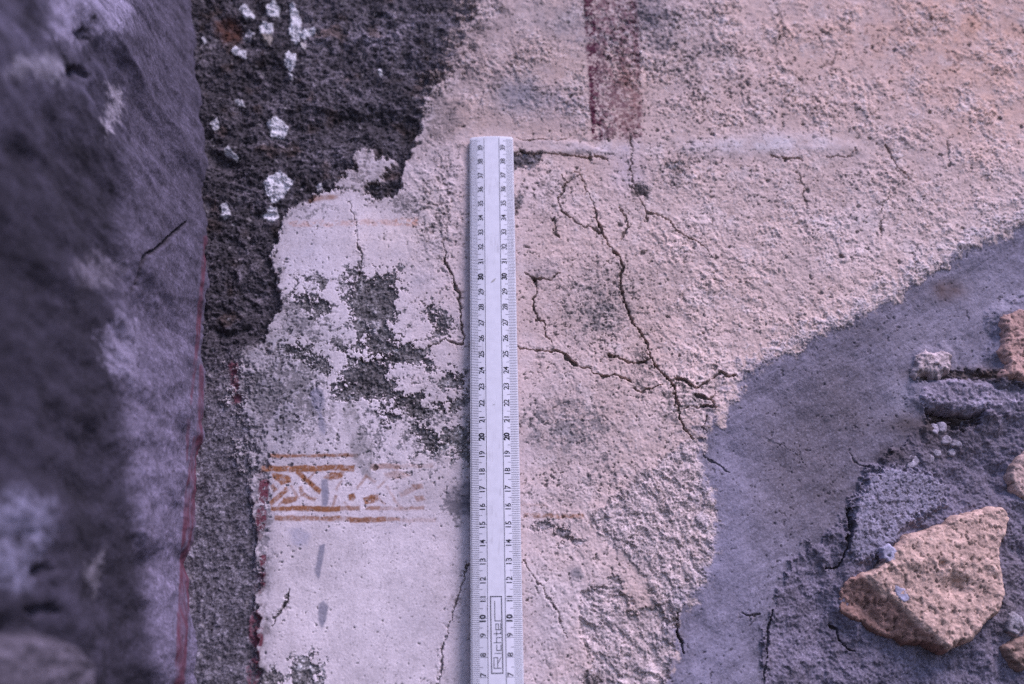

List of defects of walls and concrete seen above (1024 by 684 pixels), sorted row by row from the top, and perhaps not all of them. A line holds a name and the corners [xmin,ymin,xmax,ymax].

crack [131,221,186,290]
crack [428,241,466,348]
crack [513,136,737,473]
flaking render [276,259,470,473]
crack [437,563,470,684]